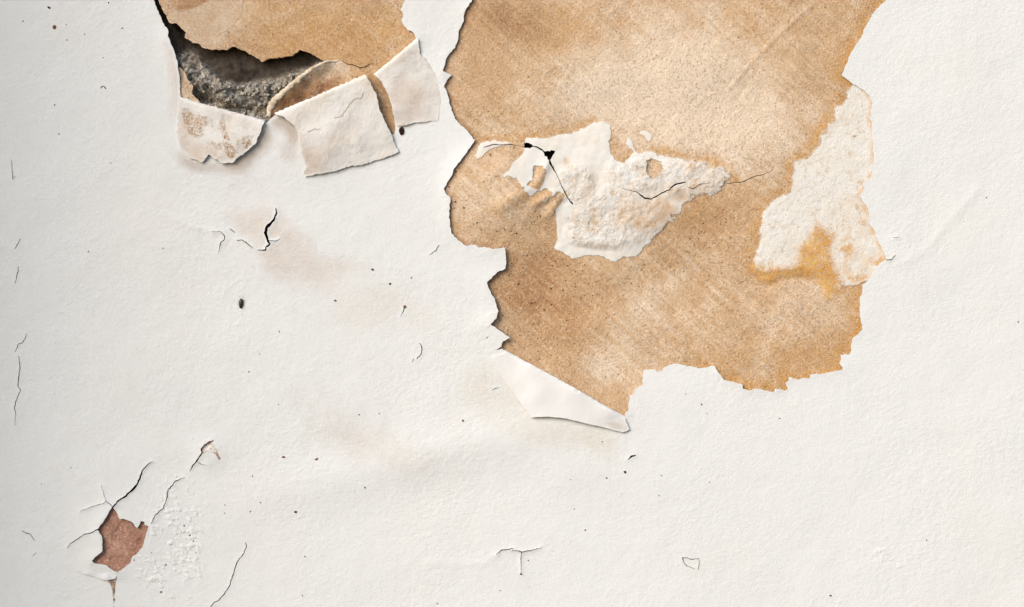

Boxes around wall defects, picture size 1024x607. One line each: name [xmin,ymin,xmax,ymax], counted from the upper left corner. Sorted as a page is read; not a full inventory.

crack [485,143,573,204]
crack [212,208,279,251]
peeling [154,0,885,432]
crack [67,462,151,548]
peeling [77,501,148,581]
crack [211,543,247,606]